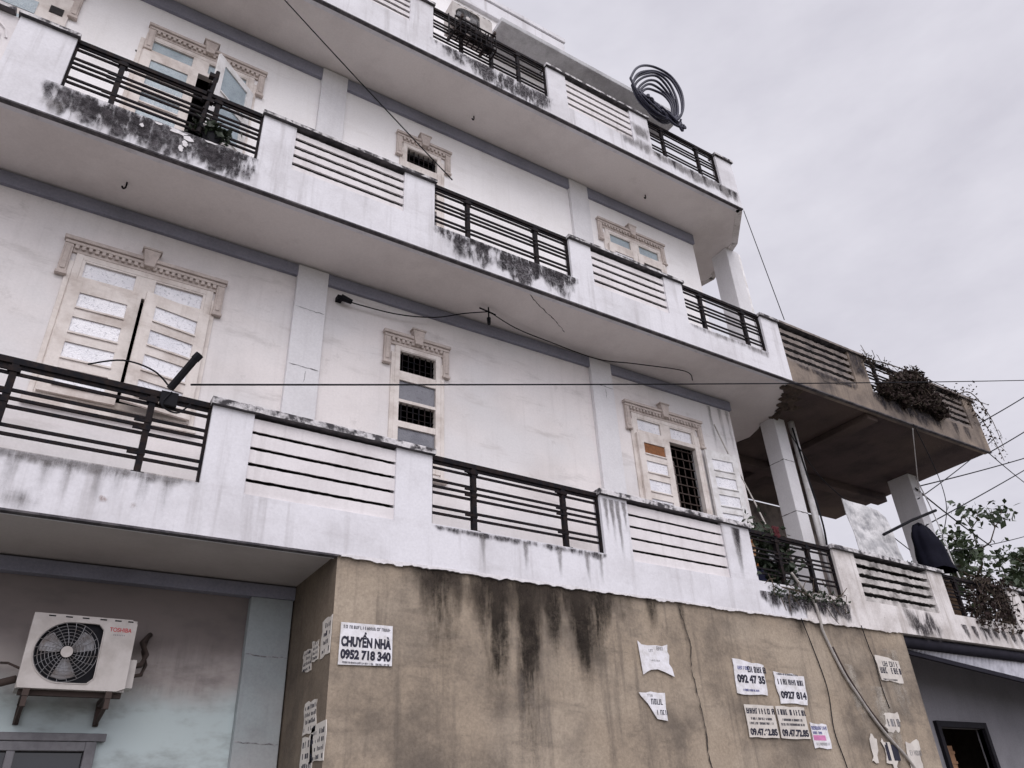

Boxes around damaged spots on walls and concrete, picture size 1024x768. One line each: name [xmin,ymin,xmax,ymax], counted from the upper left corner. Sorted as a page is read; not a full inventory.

leakage [435,40,550,107]
leakage [44,82,255,178]
leakage [438,226,576,296]
leakage [436,525,606,562]
leakage [421,568,611,692]
leakage [760,590,851,631]
crack [678,606,713,768]